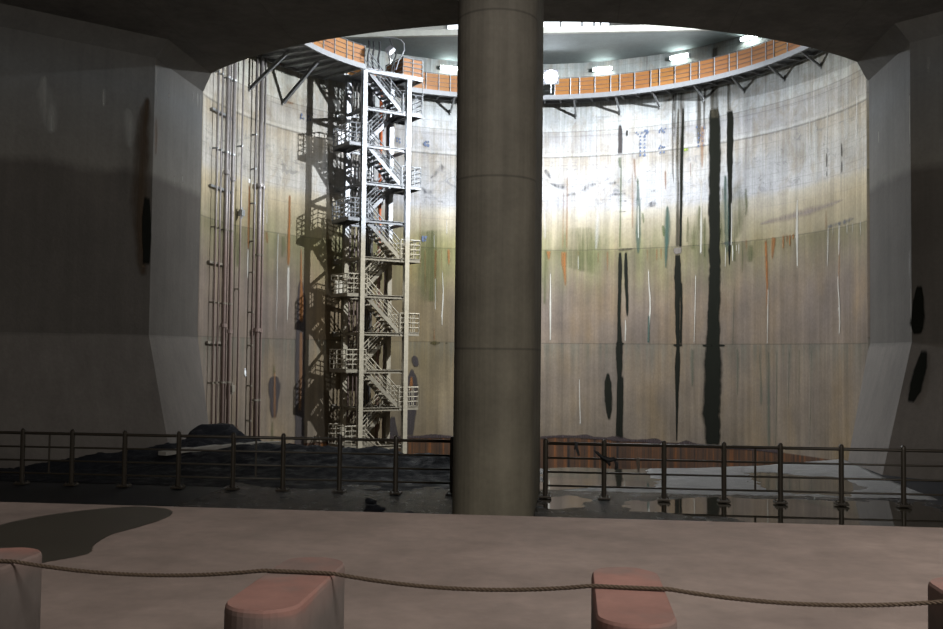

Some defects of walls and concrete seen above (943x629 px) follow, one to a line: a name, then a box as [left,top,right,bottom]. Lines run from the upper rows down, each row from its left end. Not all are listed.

water stain [541,84,778,453]
rust [765,235,794,335]
water stain [269,376,280,417]